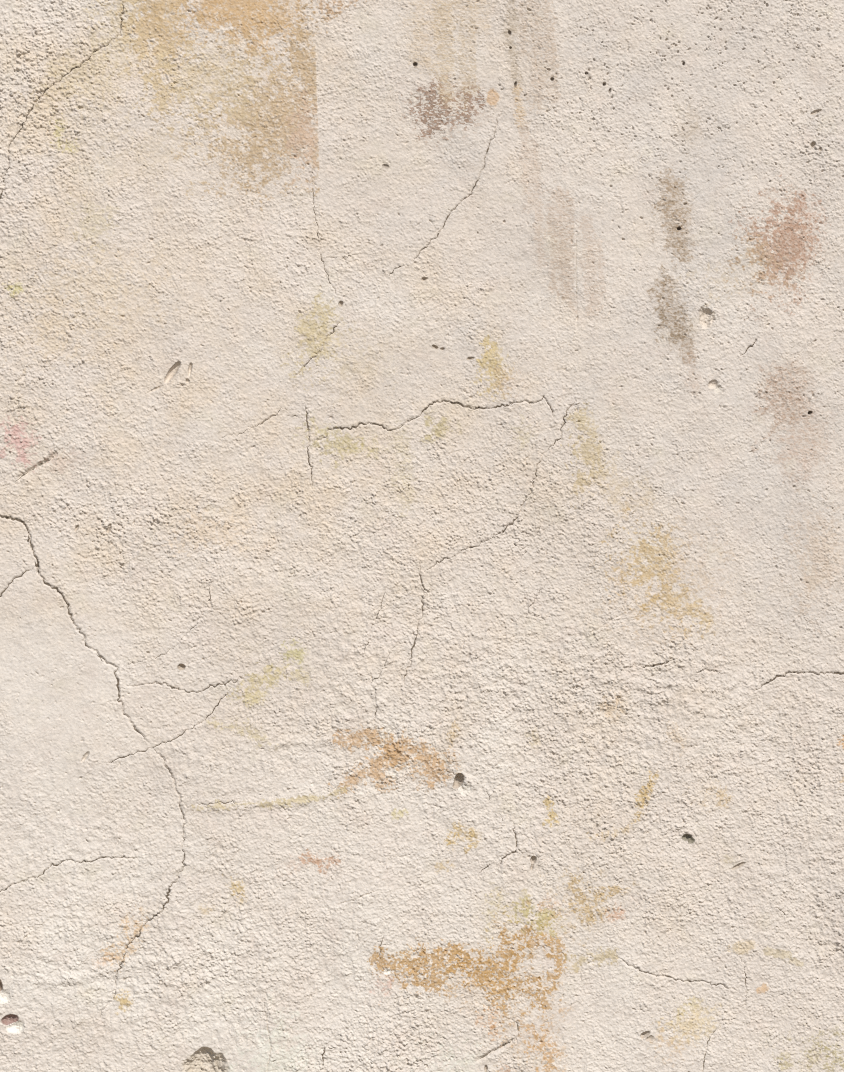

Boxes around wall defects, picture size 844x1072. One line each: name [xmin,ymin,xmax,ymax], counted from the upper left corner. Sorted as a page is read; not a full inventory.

crack [0,1,125,199]
damp [0,0,611,387]
crack [390,110,503,274]
damp [636,81,710,402]
crack [0,516,239,1010]
corrosion [189,715,467,823]
crack [224,396,580,727]
corrosion [356,765,670,1072]
crack [756,672,844,690]